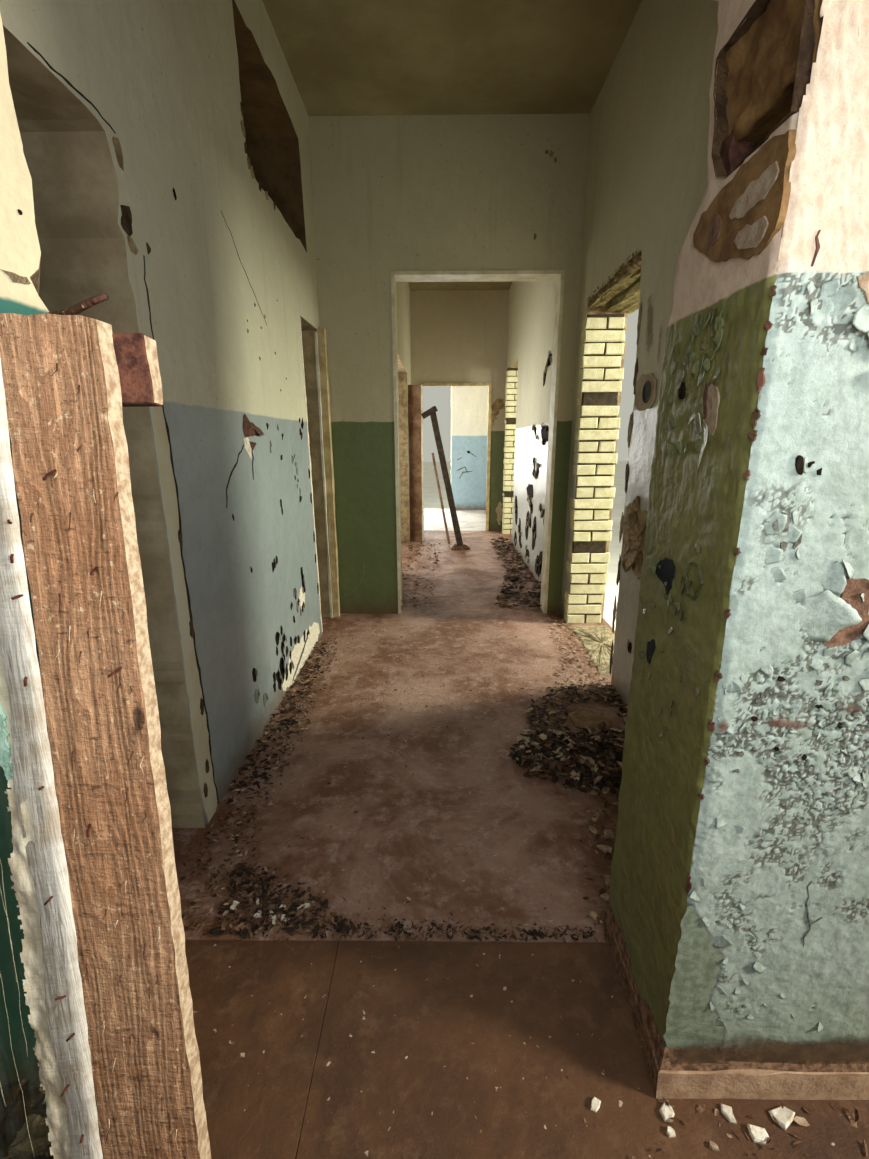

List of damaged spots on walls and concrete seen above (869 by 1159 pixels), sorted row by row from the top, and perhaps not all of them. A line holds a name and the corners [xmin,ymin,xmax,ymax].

spalling [693,0,832,262]
peeling [1,269,31,285]
peeling [807,272,869,353]
flaking render [150,405,219,823]
peeling [242,317,323,707]
peeling [495,457,545,577]
peeling [532,422,549,446]
flaking render [609,463,691,680]
peeling [795,455,822,475]
peeling [793,559,869,667]
peeling [663,874,766,1049]
crack [803,881,823,948]